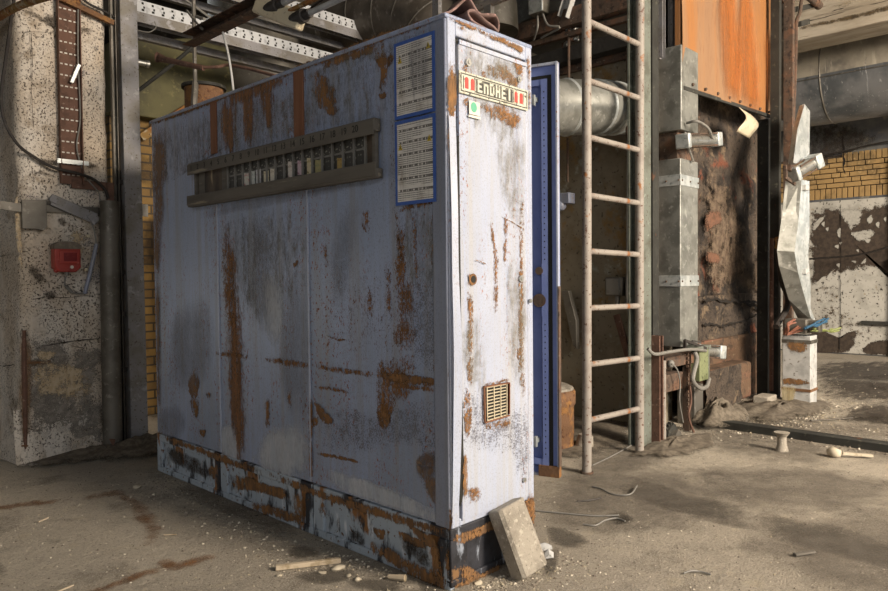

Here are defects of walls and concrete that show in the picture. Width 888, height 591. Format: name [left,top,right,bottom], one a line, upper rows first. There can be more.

spalling [704,158,757,305]
peeling [808,204,888,355]